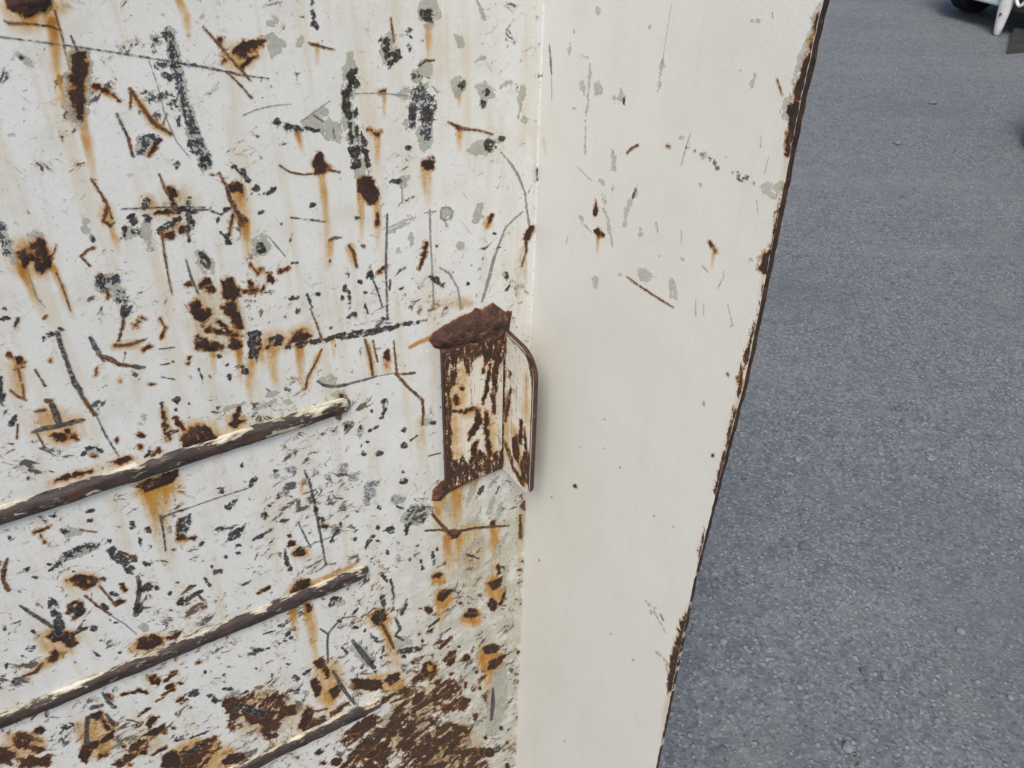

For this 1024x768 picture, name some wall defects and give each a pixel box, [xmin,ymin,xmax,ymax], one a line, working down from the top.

rust [4,0,153,151]
peeling [149,26,215,176]
rust [279,151,340,217]
peeling [271,51,369,179]
peeling [378,0,442,153]
rust [777,11,820,157]
rust [15,230,71,311]
rust [153,172,319,378]
rust [112,408,218,466]
rust [435,334,533,517]
rust [59,547,520,768]
rust [0,726,56,768]